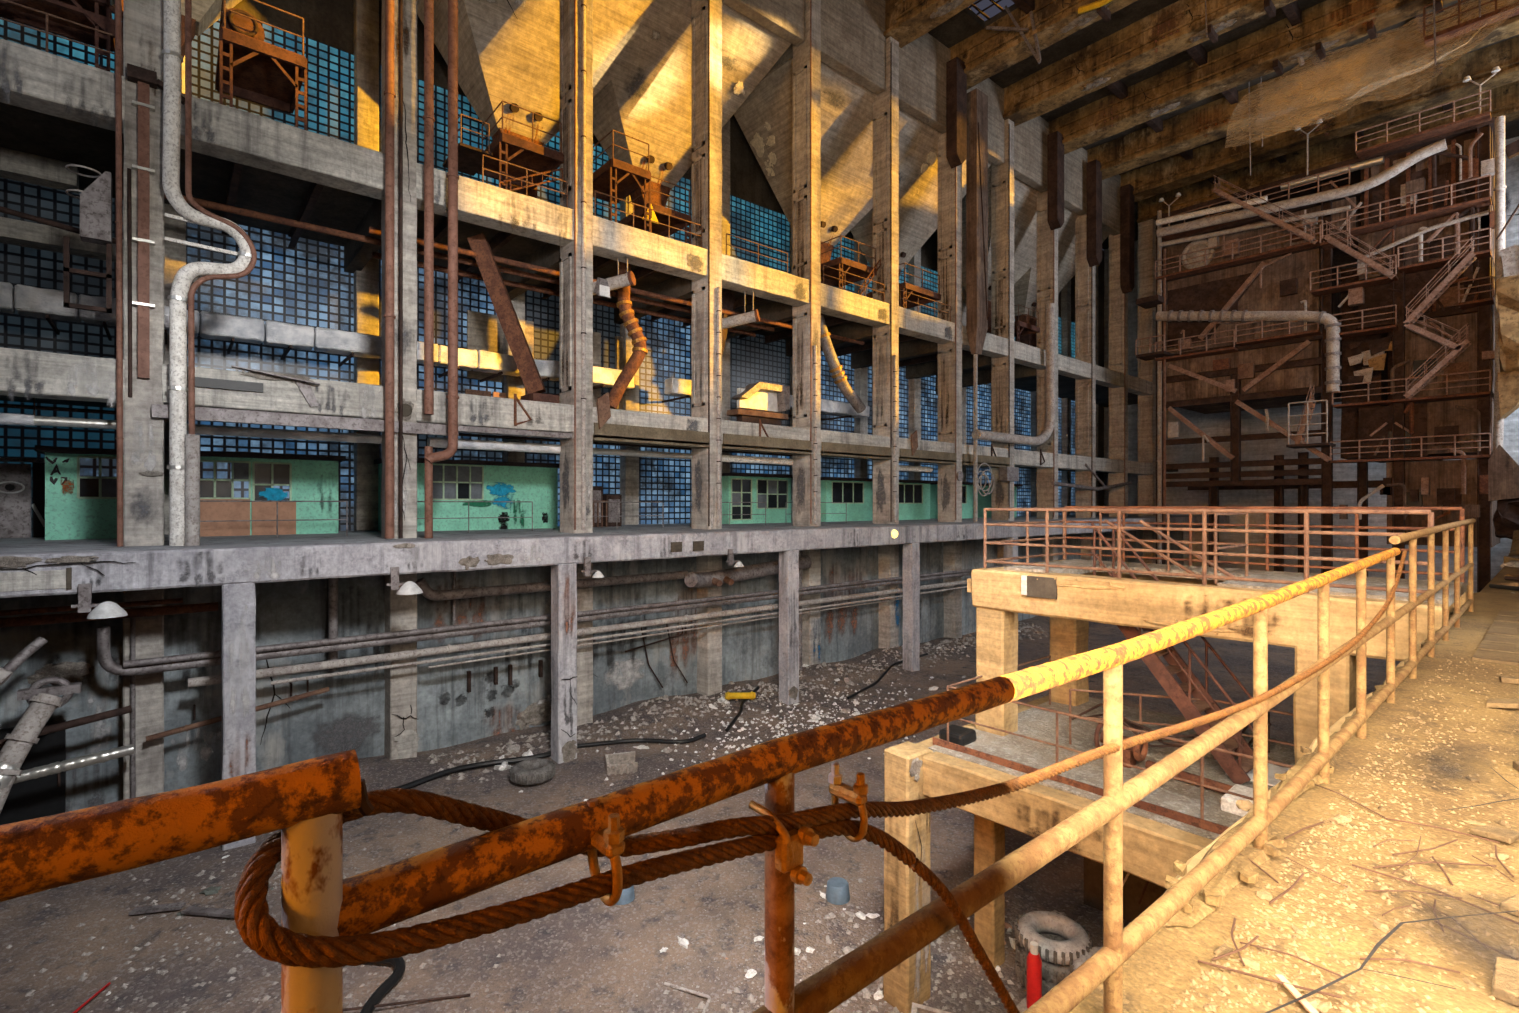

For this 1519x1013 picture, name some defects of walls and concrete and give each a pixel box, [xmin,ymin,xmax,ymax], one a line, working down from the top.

spalling [0,591,124,812]
spalling [164,585,222,792]
spalling [255,554,552,772]
leakage [484,630,532,736]
leakage [538,690,575,734]
spalling [593,557,697,715]
spalling [722,552,779,685]
spalling [820,546,879,663]
spalling [898,542,944,646]
spalling [962,538,997,635]
spalling [1018,530,1143,590]
spalling [1166,527,1183,565]